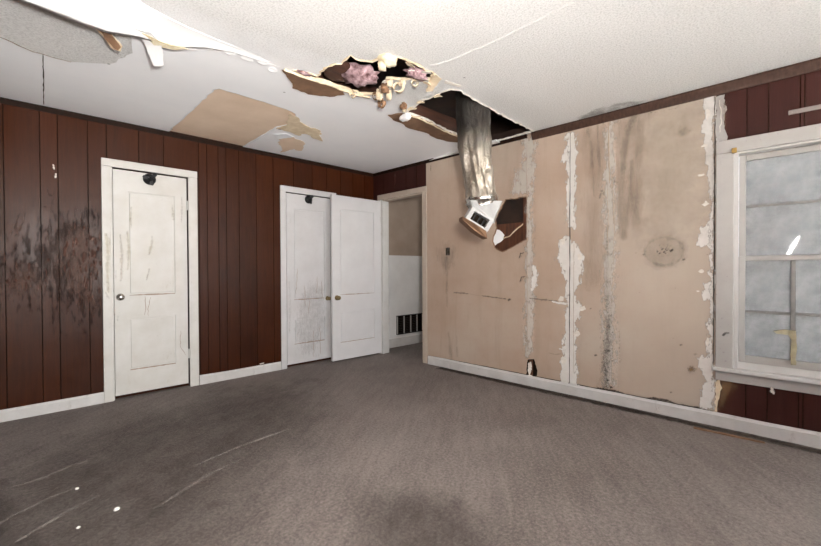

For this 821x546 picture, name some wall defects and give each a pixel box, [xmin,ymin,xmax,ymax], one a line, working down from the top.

peeling [21,0,279,73]
peeling [273,113,323,153]
peeling [701,94,728,147]
spalling [492,196,527,258]